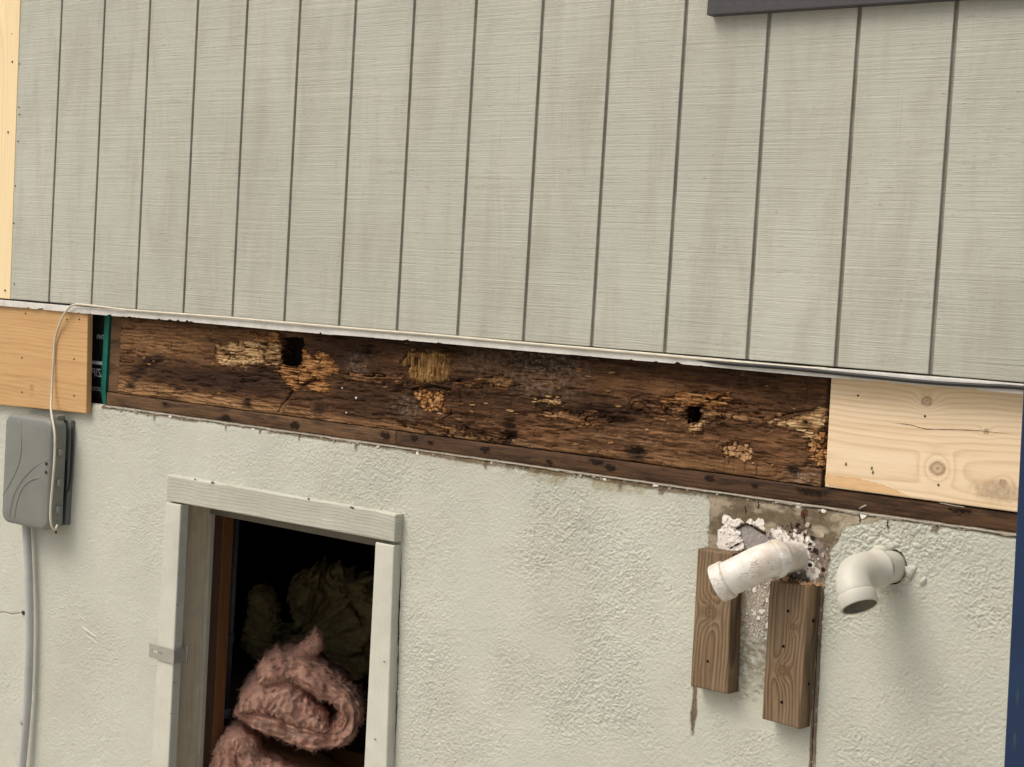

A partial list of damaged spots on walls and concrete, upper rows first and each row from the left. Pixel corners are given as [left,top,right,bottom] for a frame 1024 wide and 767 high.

damp [101,402,973,532]
peeling [105,406,1016,693]